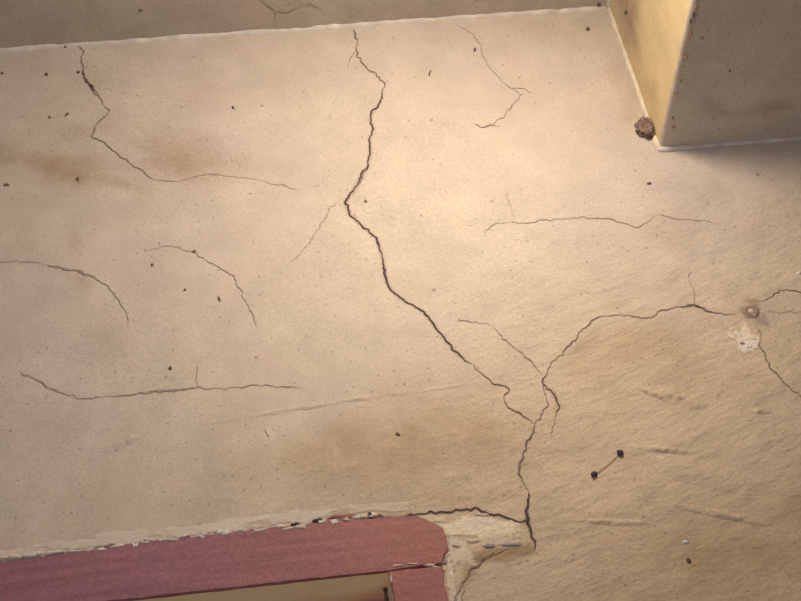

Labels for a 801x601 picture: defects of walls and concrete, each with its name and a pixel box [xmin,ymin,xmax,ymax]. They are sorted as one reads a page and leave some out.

crack [79,46,301,190]
crack [0,260,129,326]
crack [146,245,257,326]
crack [291,25,729,600]
flaking render [726,321,761,354]
crack [755,289,801,396]
crack [20,369,300,399]
flaking render [0,502,408,562]
flaking render [390,513,525,601]